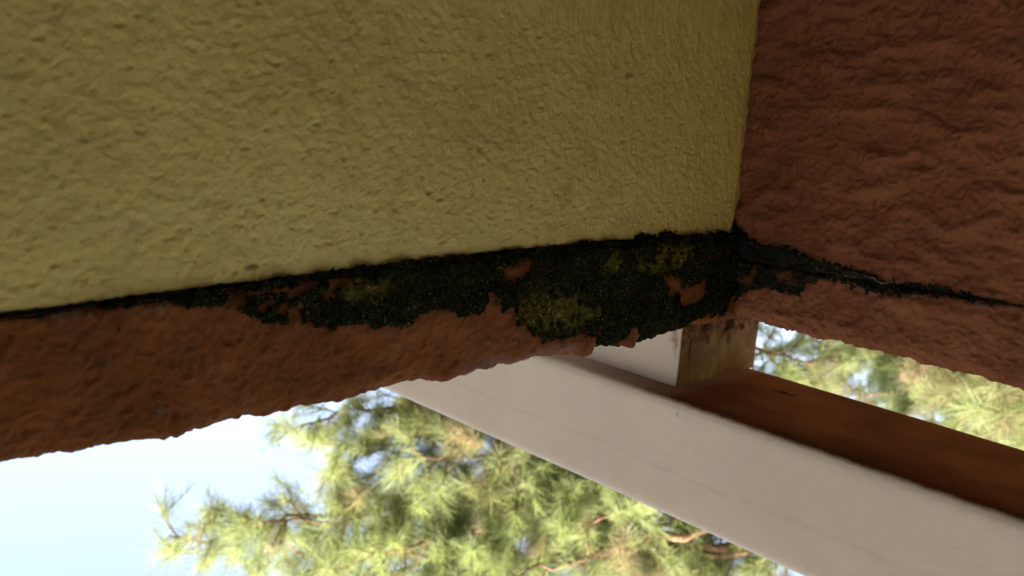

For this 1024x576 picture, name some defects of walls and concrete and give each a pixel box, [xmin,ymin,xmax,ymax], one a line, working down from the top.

damp [98,230,758,387]
crack [733,227,1024,307]